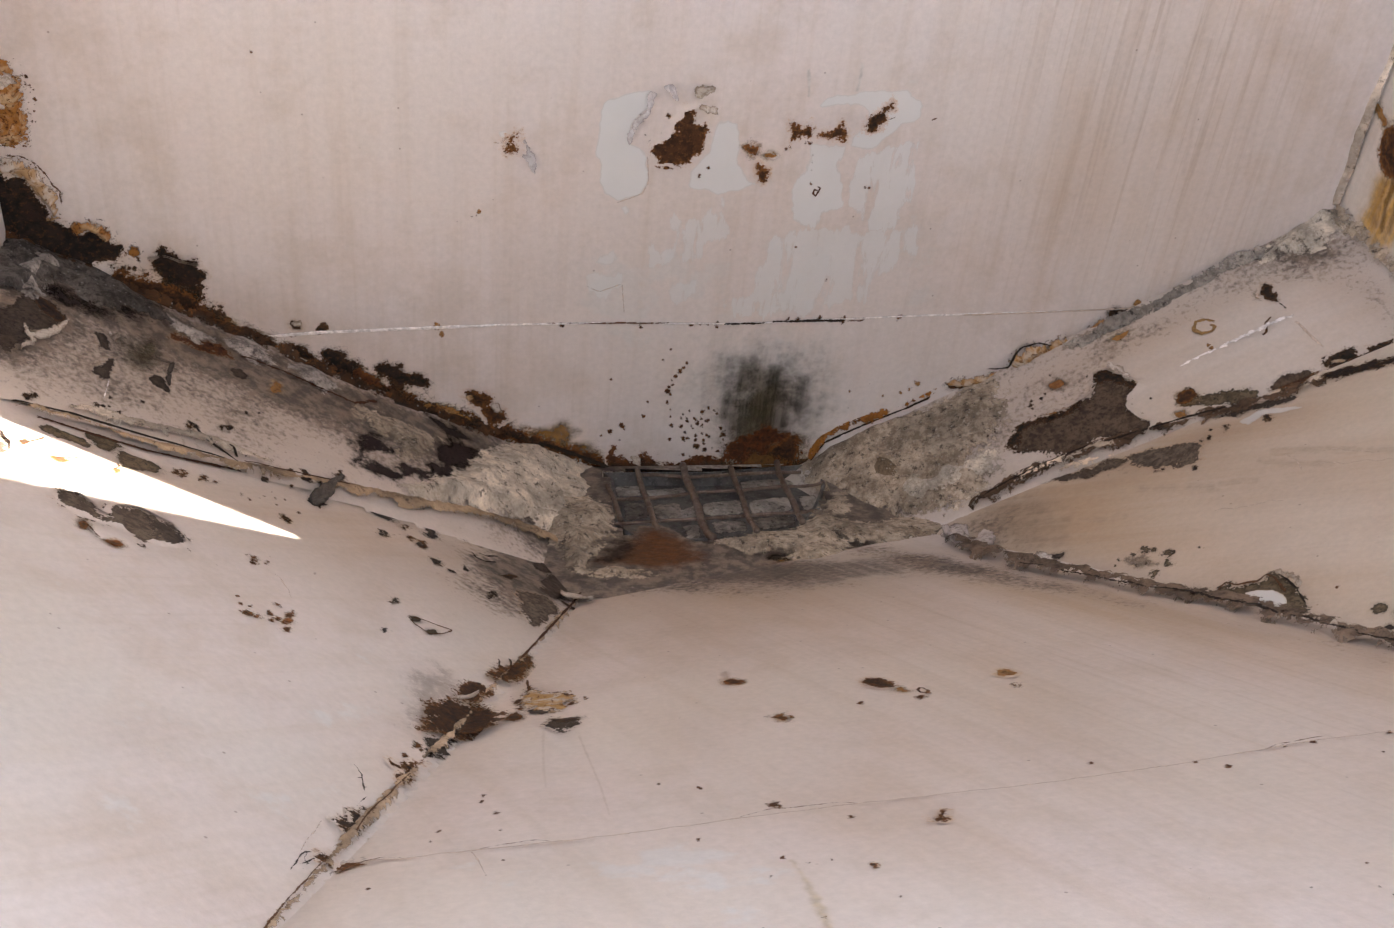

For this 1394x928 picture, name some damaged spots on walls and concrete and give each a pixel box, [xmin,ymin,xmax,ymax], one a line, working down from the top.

corrosion [1352,103,1394,260]
water stain [1258,204,1394,278]
crack [550,319,669,327]
crack [724,318,863,326]
peeling [0,423,161,474]
water stain [652,313,1130,594]
peeling [1002,361,1316,482]
peeling [43,485,197,551]
water stain [347,403,660,580]
crack [520,592,581,659]
peeling [1212,568,1315,615]
crack [264,821,326,928]